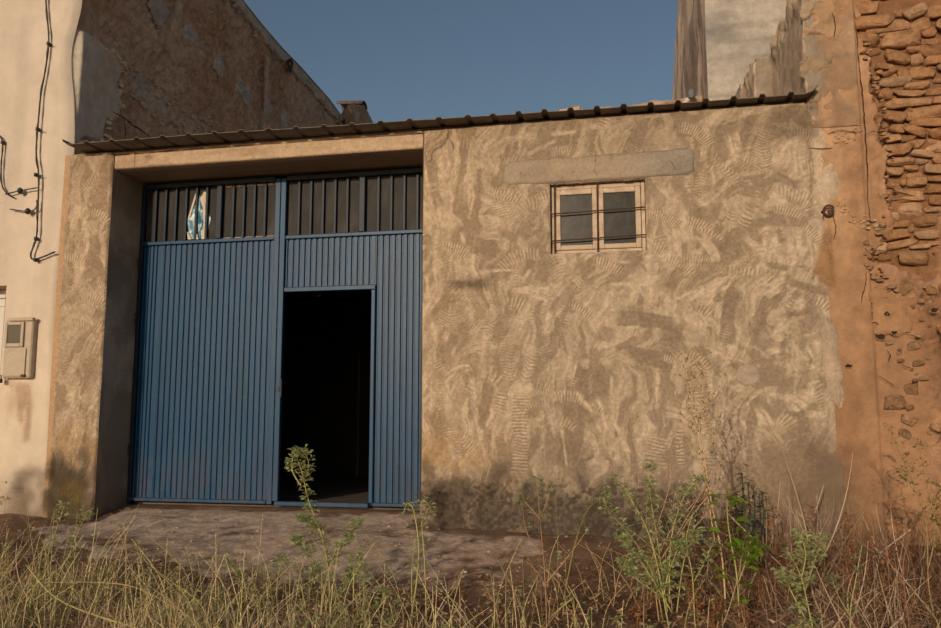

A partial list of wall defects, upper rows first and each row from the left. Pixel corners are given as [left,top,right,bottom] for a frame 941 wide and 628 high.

crack [815,13,883,223]
leakage [12,463,85,520]
leakage [475,487,703,540]